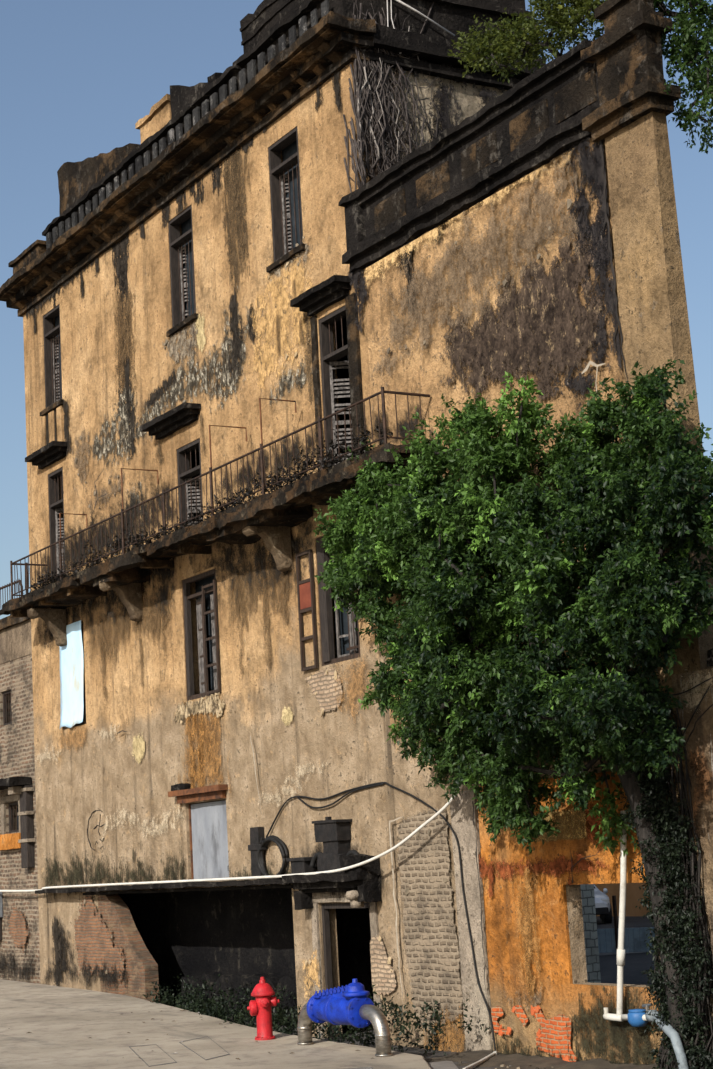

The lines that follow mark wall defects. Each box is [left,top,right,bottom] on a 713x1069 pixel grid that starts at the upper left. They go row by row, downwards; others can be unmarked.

leakage [311,62,345,112]
leakage [26,114,267,466]
leakage [436,137,622,410]
leakage [269,314,313,405]
spalling [174,692,225,724]
spalling [305,667,342,717]
leakage [41,843,187,903]
flaking render [73,895,125,982]
spalling [370,935,396,1000]
flaking render [396,808,463,1034]
corrosion [478,851,609,997]
flaking render [491,1005,578,1062]